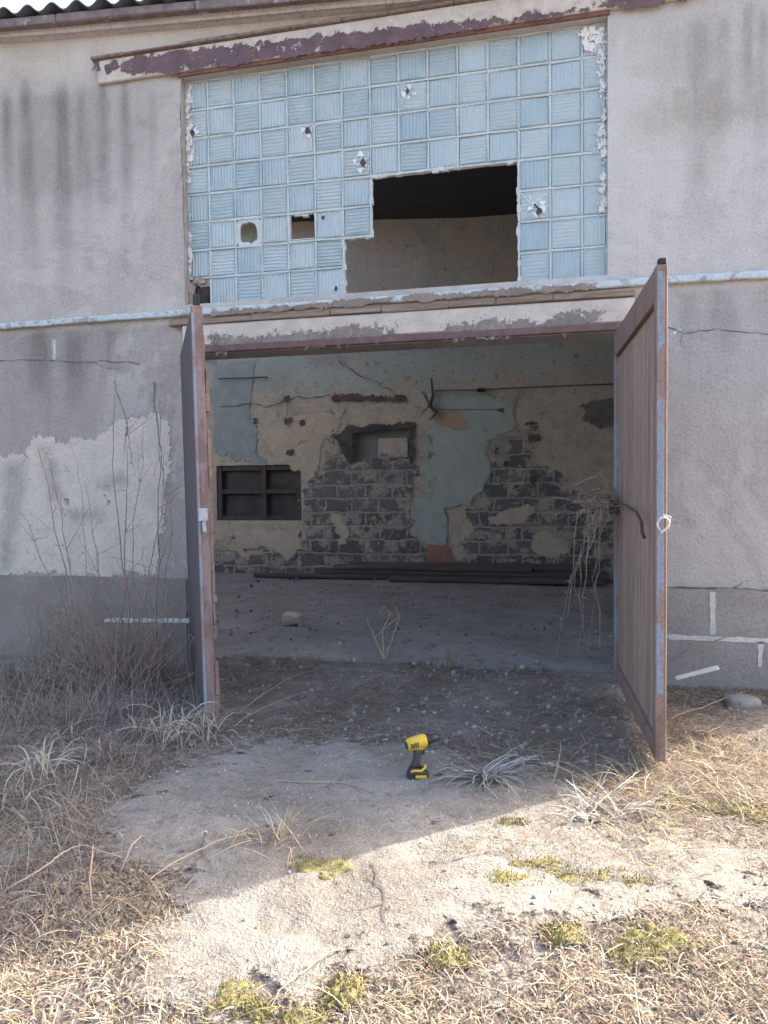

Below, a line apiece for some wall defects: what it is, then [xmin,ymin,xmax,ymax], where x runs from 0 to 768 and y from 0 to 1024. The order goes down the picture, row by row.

peeling [92,0,689,305]
crack [0,348,164,549]
peeling [0,410,173,577]
spalling [205,159,614,580]
crack [668,327,768,350]